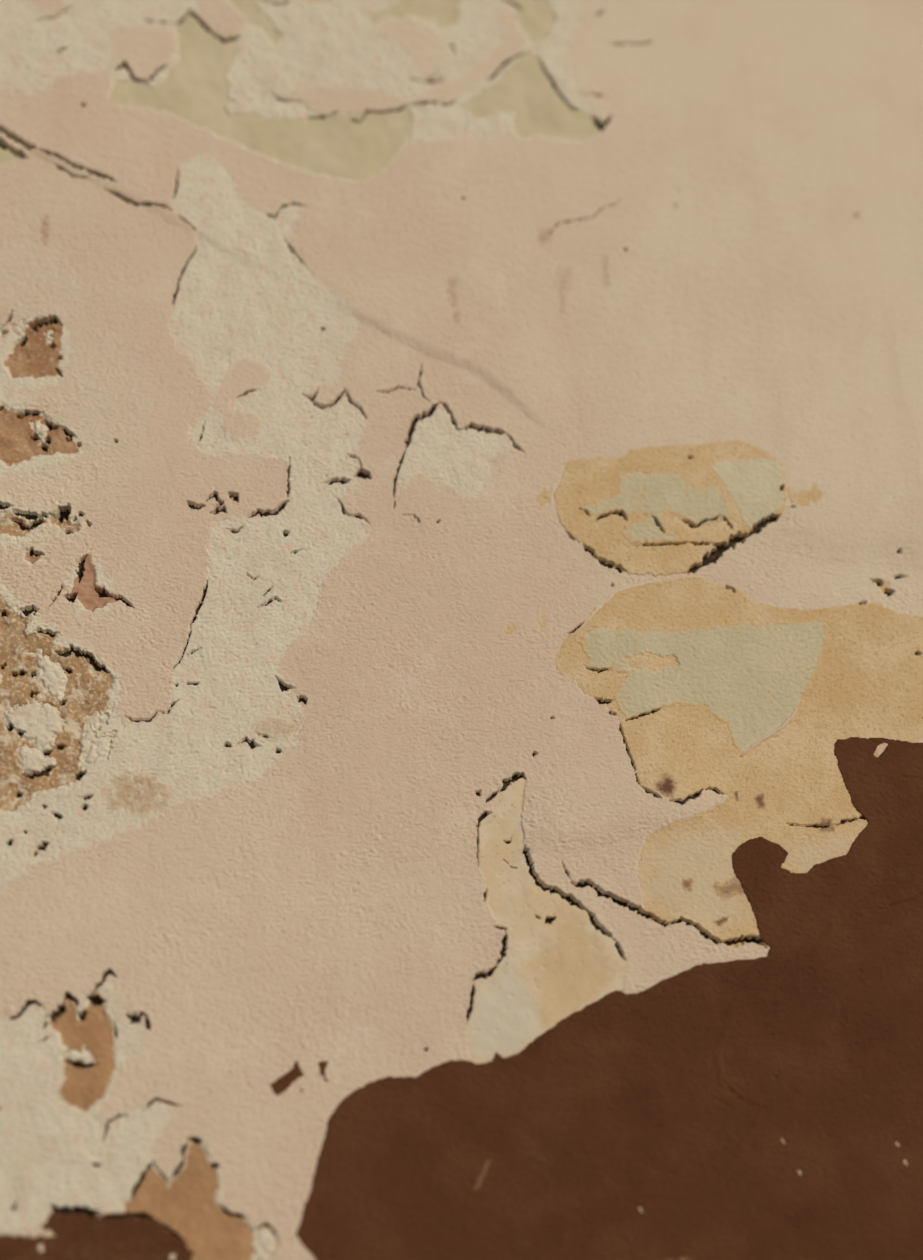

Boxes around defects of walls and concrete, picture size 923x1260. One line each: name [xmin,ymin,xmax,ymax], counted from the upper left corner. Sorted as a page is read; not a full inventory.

crack [0,129,195,230]
peeling [0,0,657,181]
peeling [0,153,374,892]
peeling [381,372,525,506]
peeling [535,440,923,948]
peeling [466,774,628,1064]
peeling [0,969,279,1260]